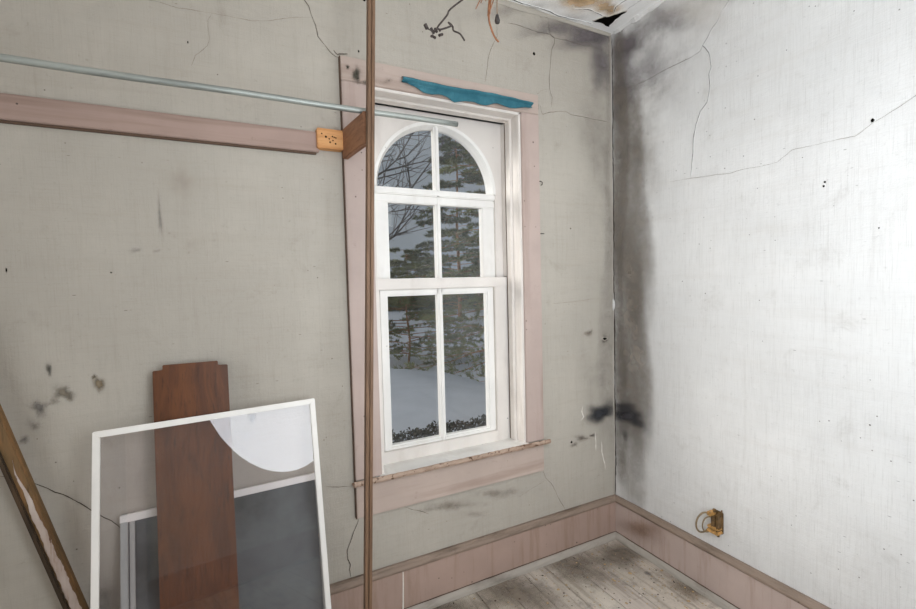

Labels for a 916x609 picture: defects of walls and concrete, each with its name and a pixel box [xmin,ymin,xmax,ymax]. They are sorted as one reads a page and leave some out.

crack [151,0,338,66]
damp [570,0,613,10]
damp [551,25,649,431]
crack [510,0,916,494]